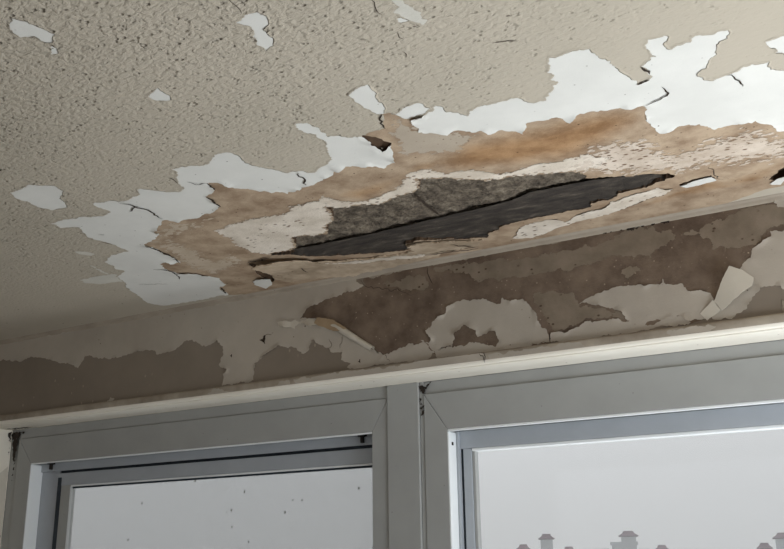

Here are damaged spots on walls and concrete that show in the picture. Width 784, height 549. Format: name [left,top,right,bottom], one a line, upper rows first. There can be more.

peeling [6,17,60,55]
peeling [234,10,276,51]
peeling [392,0,428,25]
flaking render [0,28,784,395]
leakage [300,202,784,354]